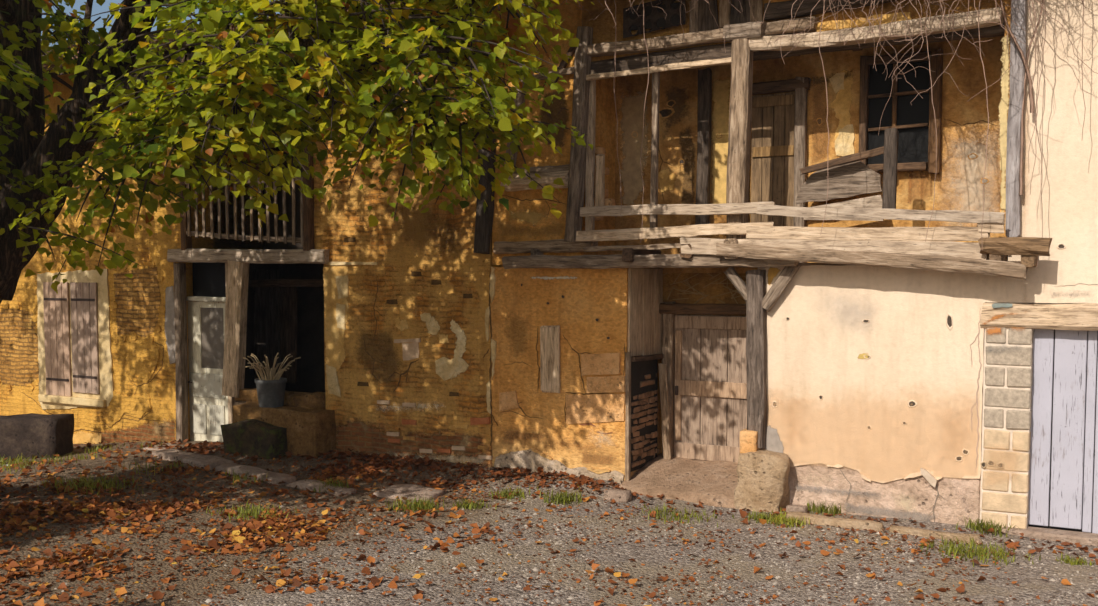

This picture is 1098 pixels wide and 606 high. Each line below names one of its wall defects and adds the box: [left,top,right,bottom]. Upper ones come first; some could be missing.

peeling [829,70,855,156]
peeling [435,355,470,396]
crack [970,308,982,472]
spalling [335,400,493,460]
spalling [788,460,1004,526]